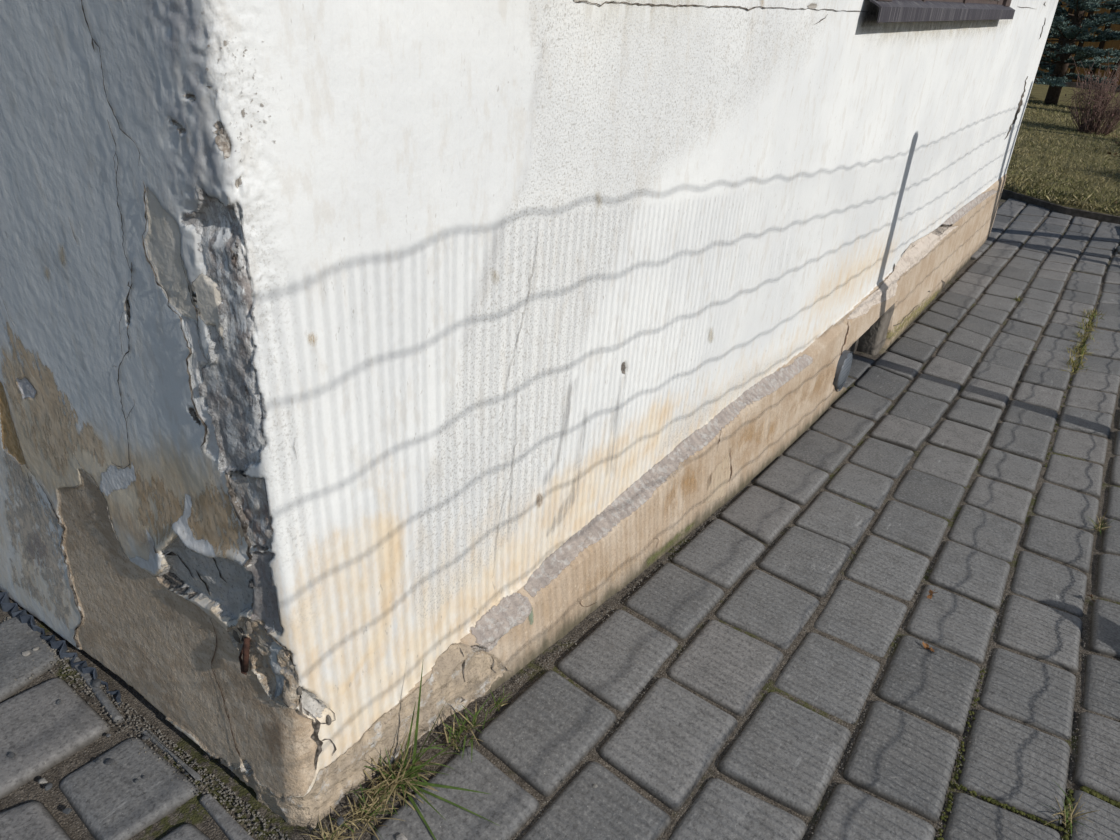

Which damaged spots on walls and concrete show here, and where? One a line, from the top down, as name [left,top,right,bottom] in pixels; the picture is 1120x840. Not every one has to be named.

crack [3,0,212,648]
flaking render [0,186,813,829]
crack [578,1,869,25]
crack [1004,77,1028,140]